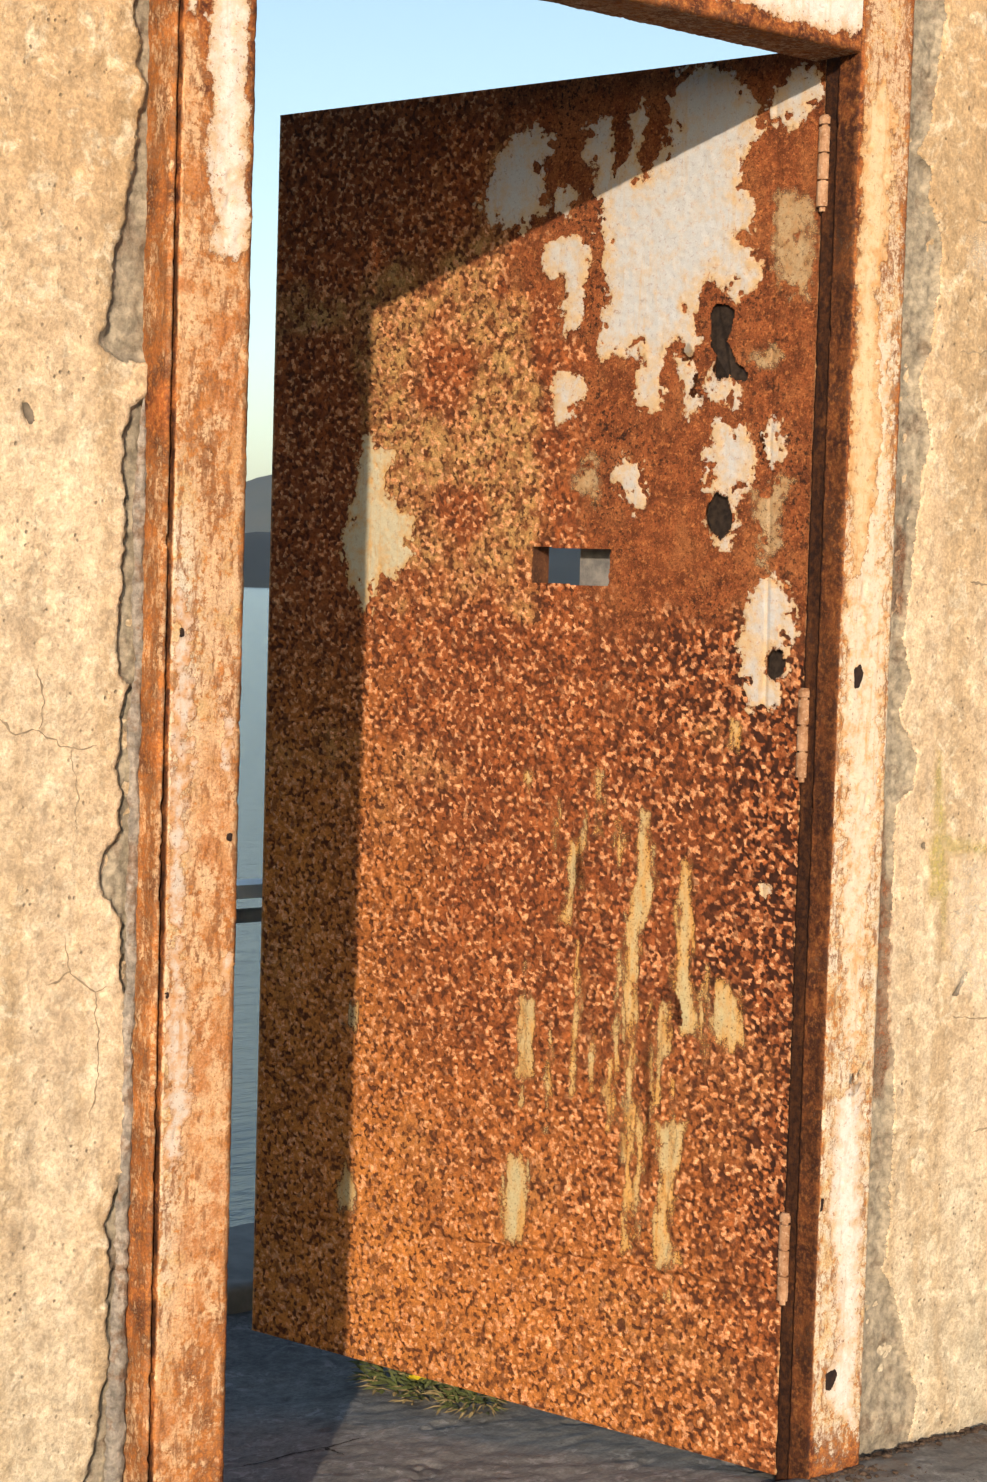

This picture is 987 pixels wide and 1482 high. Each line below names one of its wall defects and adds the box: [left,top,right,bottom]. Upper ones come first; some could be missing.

peeling [715,0,863,38]
flaking render [98,0,150,363]
peeling [472,62,826,715]
corrosion [892,526,905,615]
crack [0,670,96,835]
flaking render [822,0,947,1457]
crack [48,938,105,1133]
peeling [758,883,777,899]
corrosion [873,875,892,1097]
crack [953,1014,987,1022]